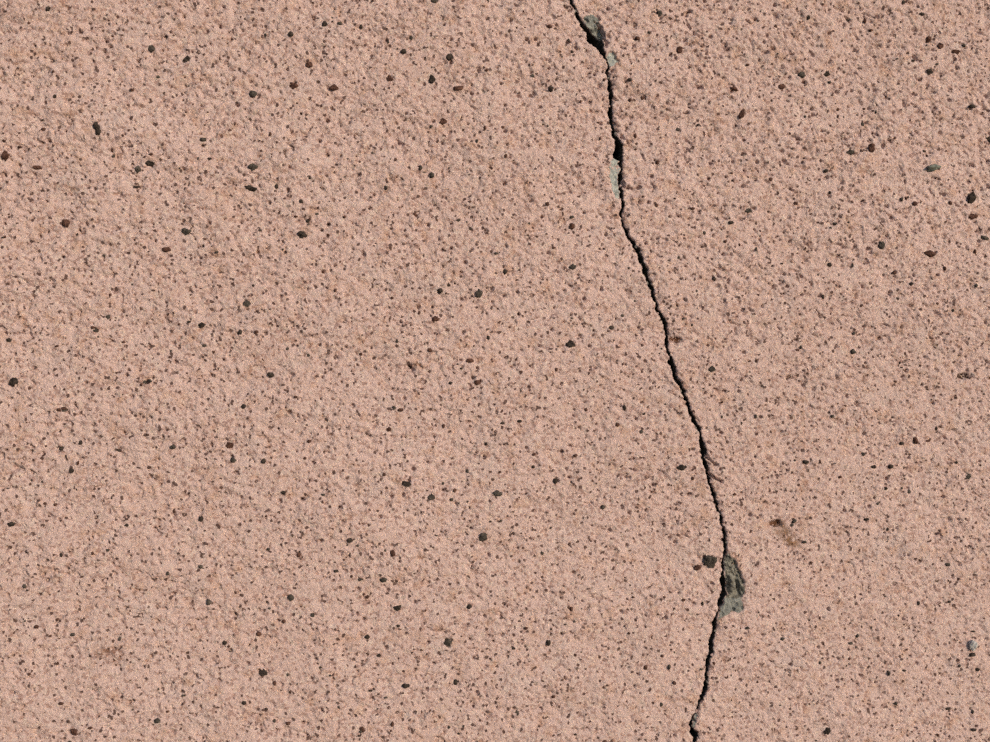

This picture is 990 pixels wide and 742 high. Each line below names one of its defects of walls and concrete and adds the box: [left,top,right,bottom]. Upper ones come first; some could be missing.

crack [568,0,727,742]